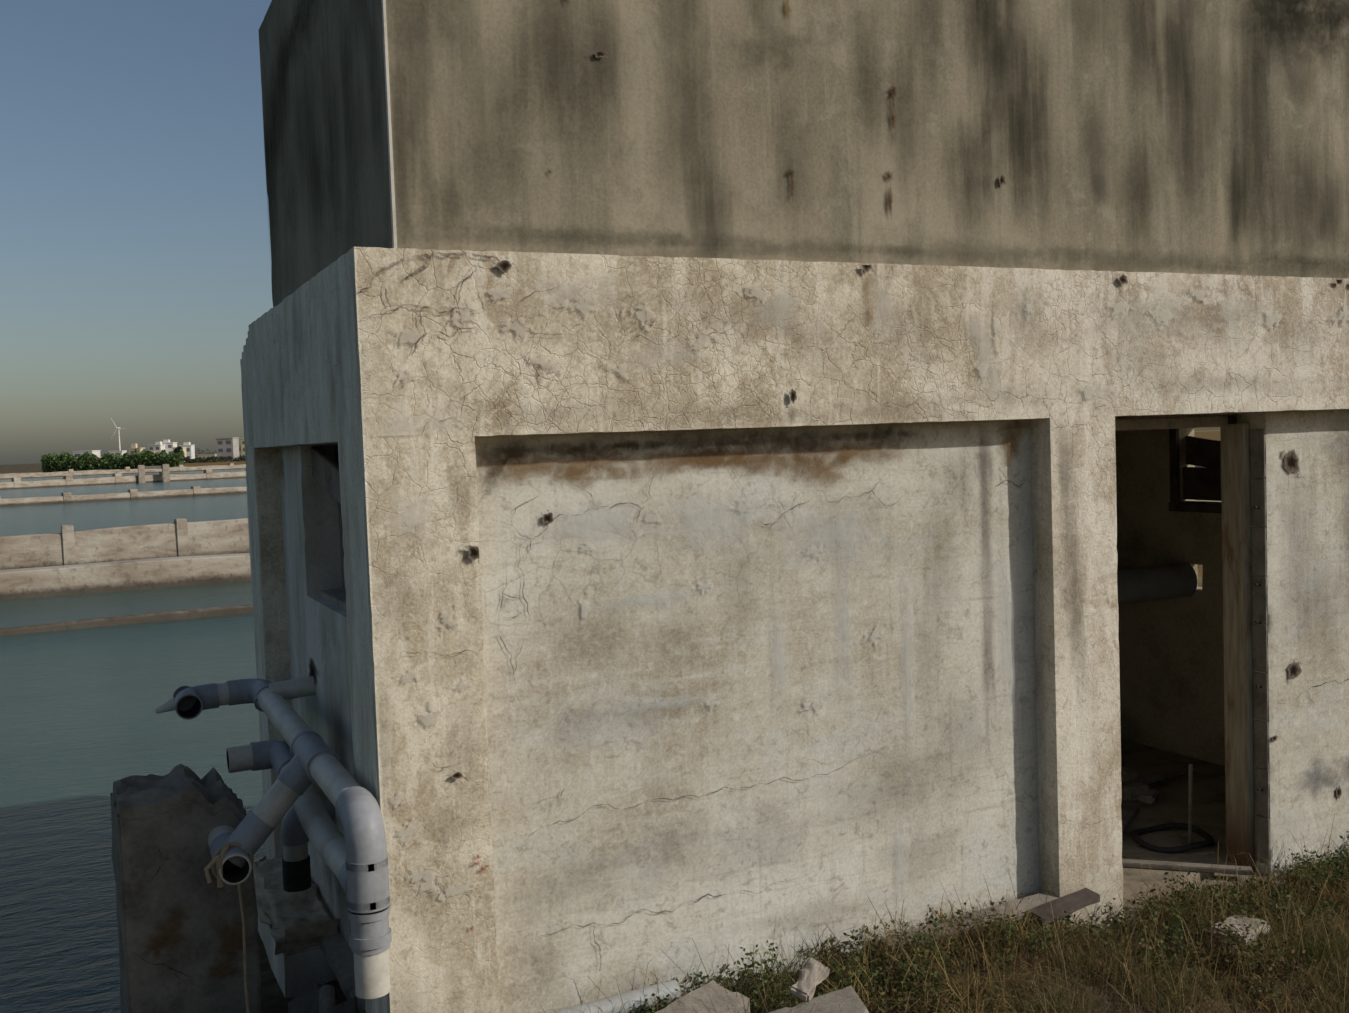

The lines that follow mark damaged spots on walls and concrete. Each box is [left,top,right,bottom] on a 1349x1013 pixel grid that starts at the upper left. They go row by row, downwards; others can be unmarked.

crack [360,252,742,382]
corrosion [567,445,617,480]
corrosion [652,427,891,478]
spalling [1281,450,1302,476]
crack [760,483,896,540]
spalling [1288,658,1303,684]
crack [546,890,745,968]